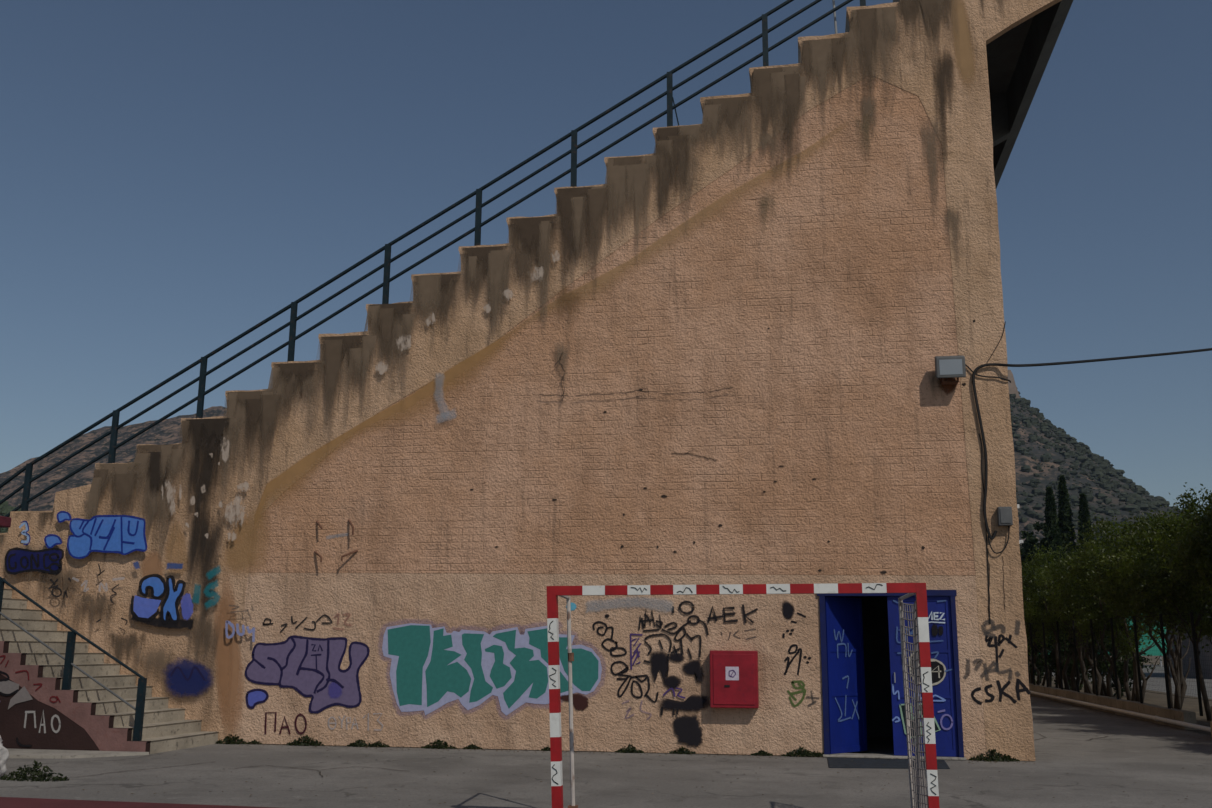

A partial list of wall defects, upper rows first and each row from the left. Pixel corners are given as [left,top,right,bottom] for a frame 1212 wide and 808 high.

water stain [86,0,974,719]
crack [540,352,733,401]